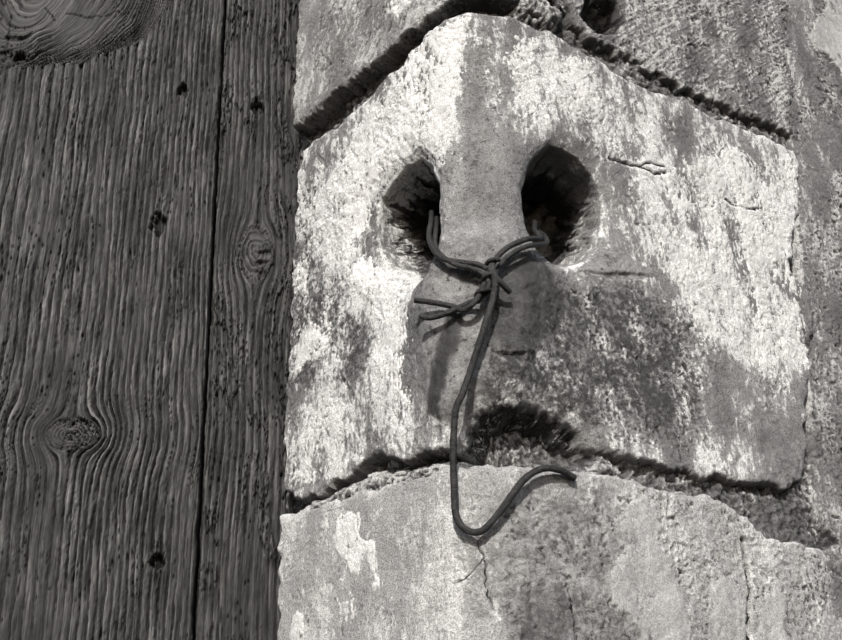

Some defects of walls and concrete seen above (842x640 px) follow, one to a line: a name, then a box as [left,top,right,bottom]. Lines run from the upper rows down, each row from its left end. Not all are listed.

crack [614,161,664,175]
crack [453,538,493,606]
crack [741,556,749,640]